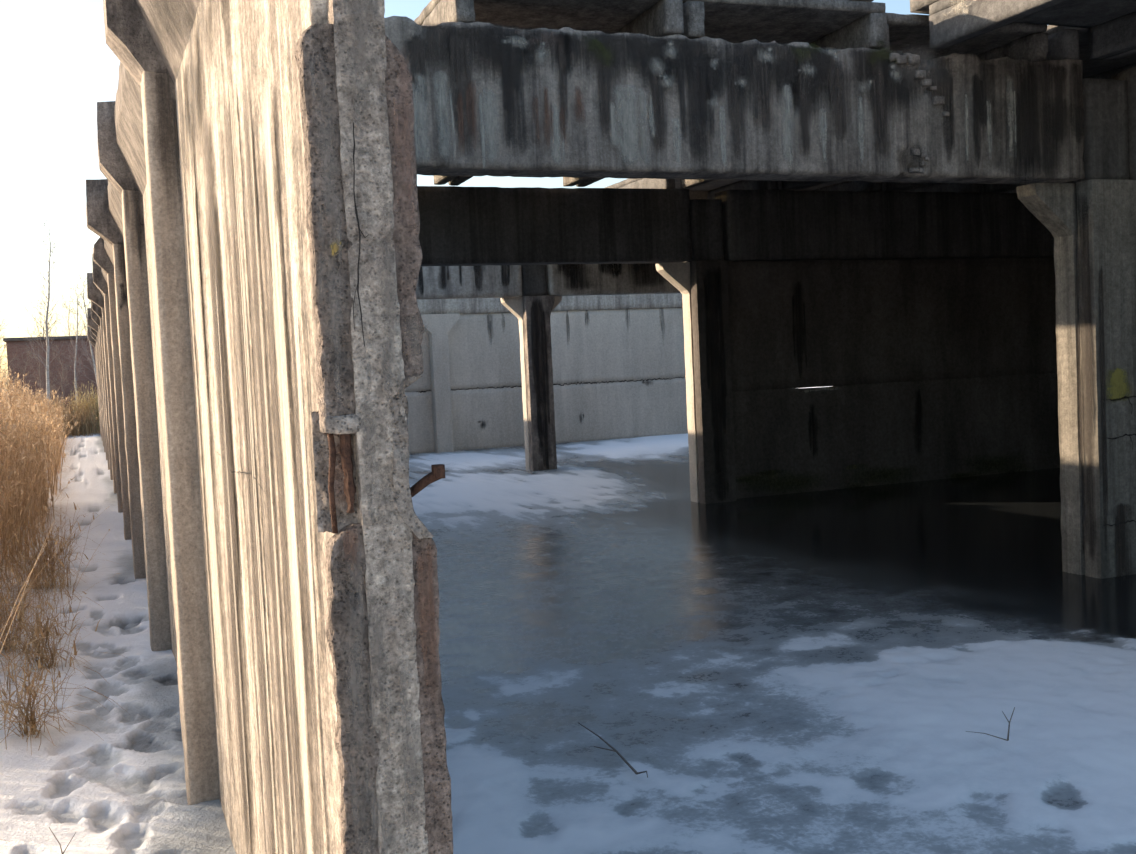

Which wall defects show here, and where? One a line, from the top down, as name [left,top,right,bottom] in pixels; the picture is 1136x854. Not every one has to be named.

leakage [407,24,1084,180]
crack [353,122,368,347]
leakage [1076,199,1132,577]